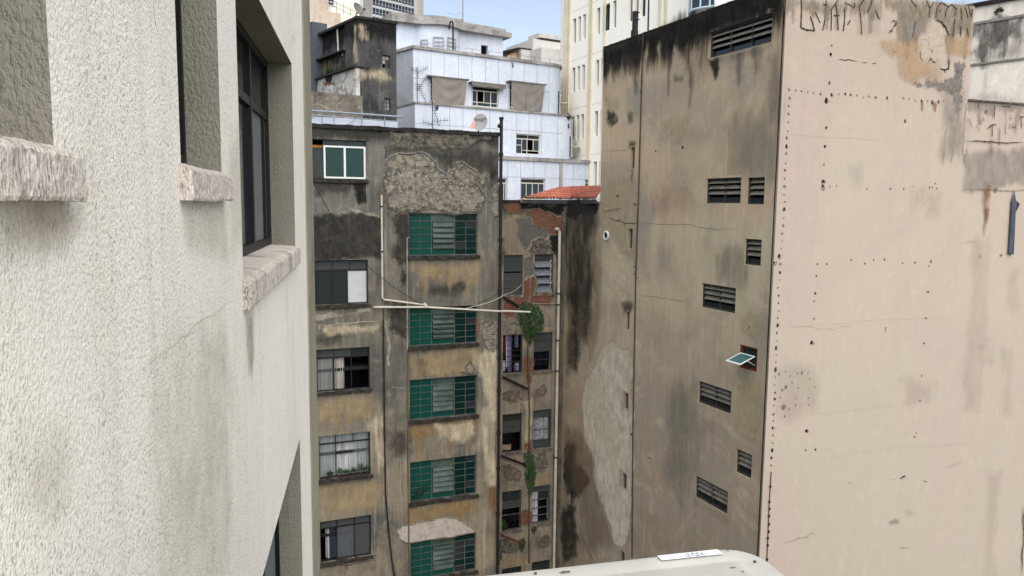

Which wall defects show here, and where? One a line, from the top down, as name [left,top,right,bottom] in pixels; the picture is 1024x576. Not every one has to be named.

damp [993,5,1006,56]
damp [644,41,678,81]
flaking render [903,62,966,112]
flaking render [343,129,561,255]
crack [147,301,234,366]
peeling [396,517,476,544]